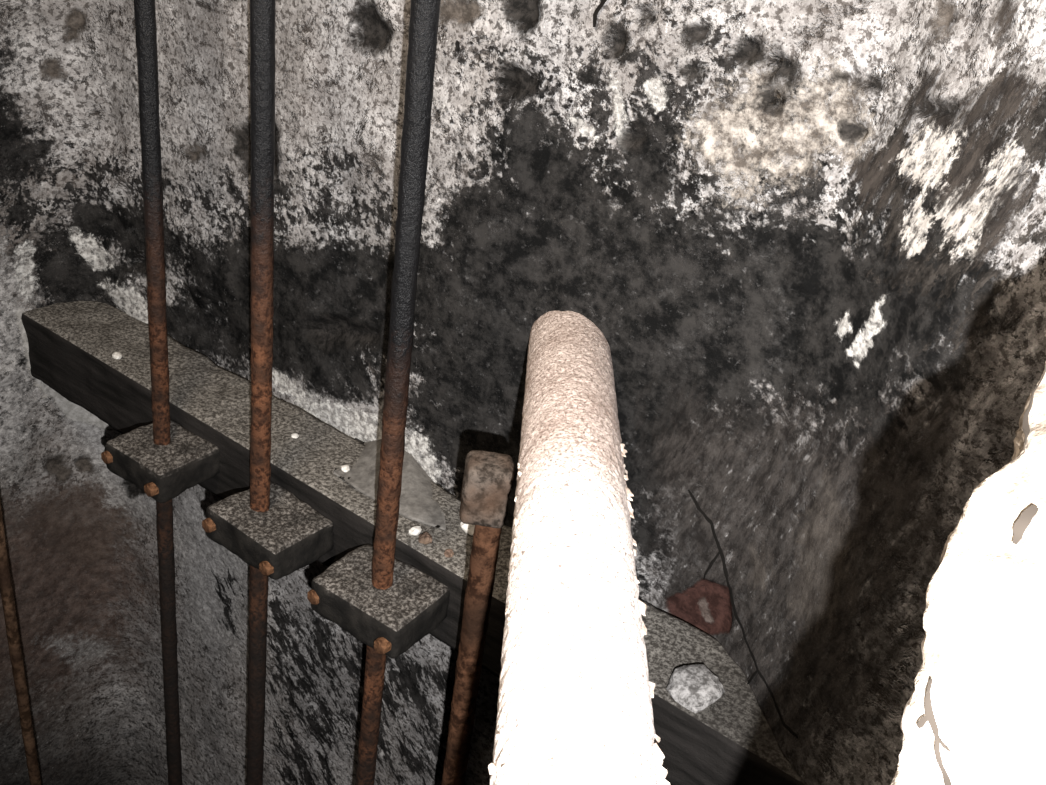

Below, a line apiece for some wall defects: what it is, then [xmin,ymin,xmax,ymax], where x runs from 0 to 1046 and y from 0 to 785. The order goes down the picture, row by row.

water stain [0,230,40,471]
crack [916,678,952,785]